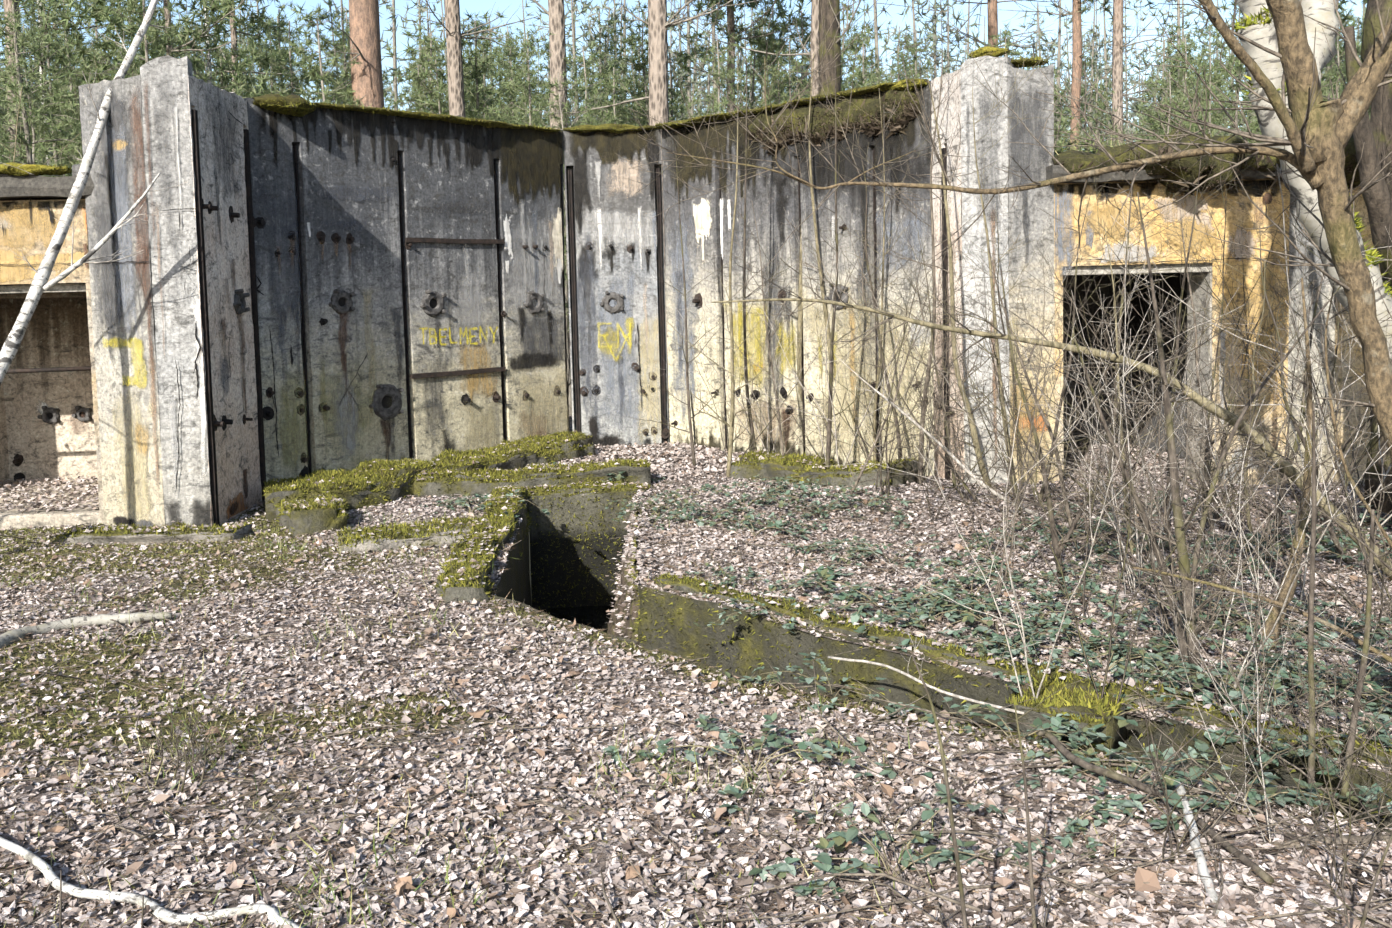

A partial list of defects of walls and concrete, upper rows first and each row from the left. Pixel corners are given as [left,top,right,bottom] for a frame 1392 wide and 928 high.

damp [260,86,944,476]
peeling [1085,193,1276,359]
rust [339,313,347,388]
rust [380,419,390,460]
peeling [1223,448,1258,486]